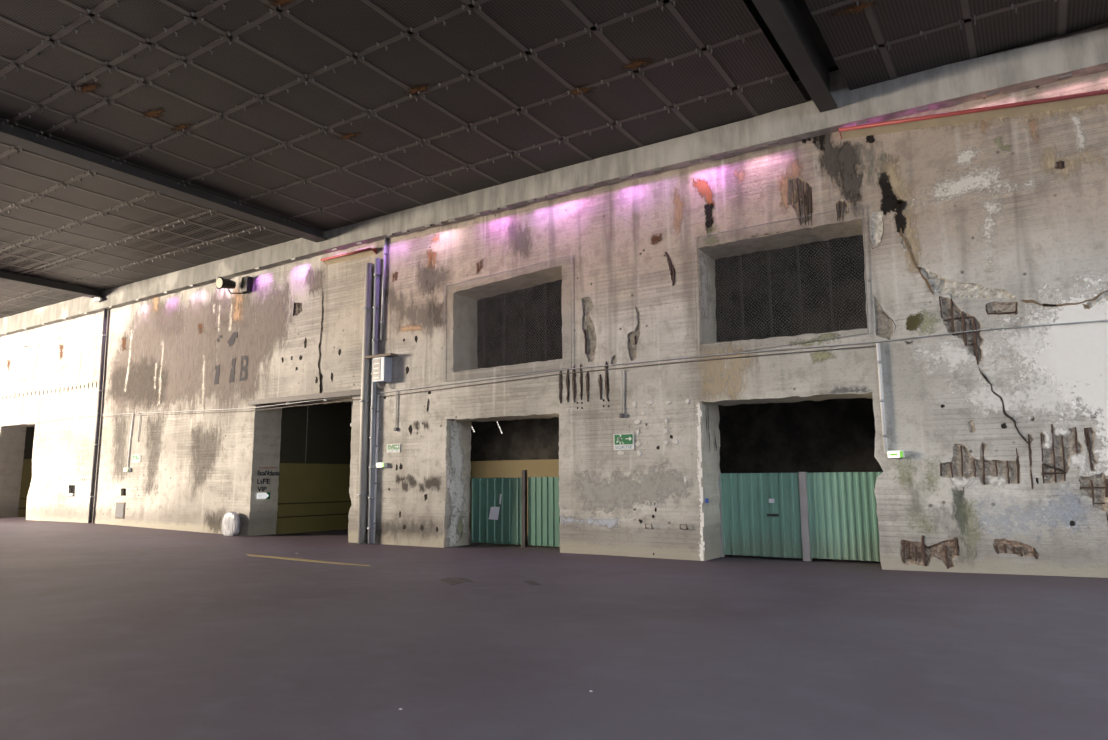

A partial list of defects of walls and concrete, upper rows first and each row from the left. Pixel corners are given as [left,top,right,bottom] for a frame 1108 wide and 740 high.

rust [693,179,714,206]
leakage [109,283,291,418]
leakage [306,268,322,294]
leakage [385,262,447,331]
crack [869,217,936,295]
spalling [920,268,1020,365]
crack [1021,290,1108,309]
crack [978,366,1065,473]
spalling [939,378,1108,512]
spalling [900,535,960,569]
leakage [953,489,976,560]
spalling [993,538,1040,559]